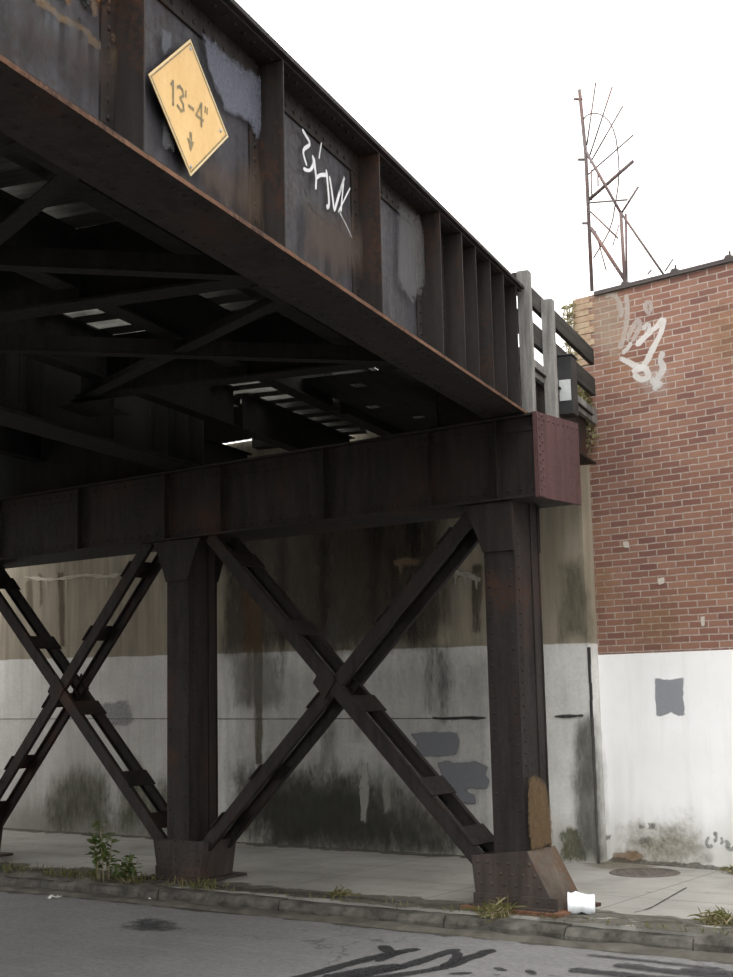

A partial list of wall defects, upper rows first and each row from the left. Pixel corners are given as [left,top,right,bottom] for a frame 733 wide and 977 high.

damp [225,567,286,653]
damp [242,520,439,650]
damp [245,764,454,850]
corrosion [527,774,553,850]
damp [575,720,733,871]